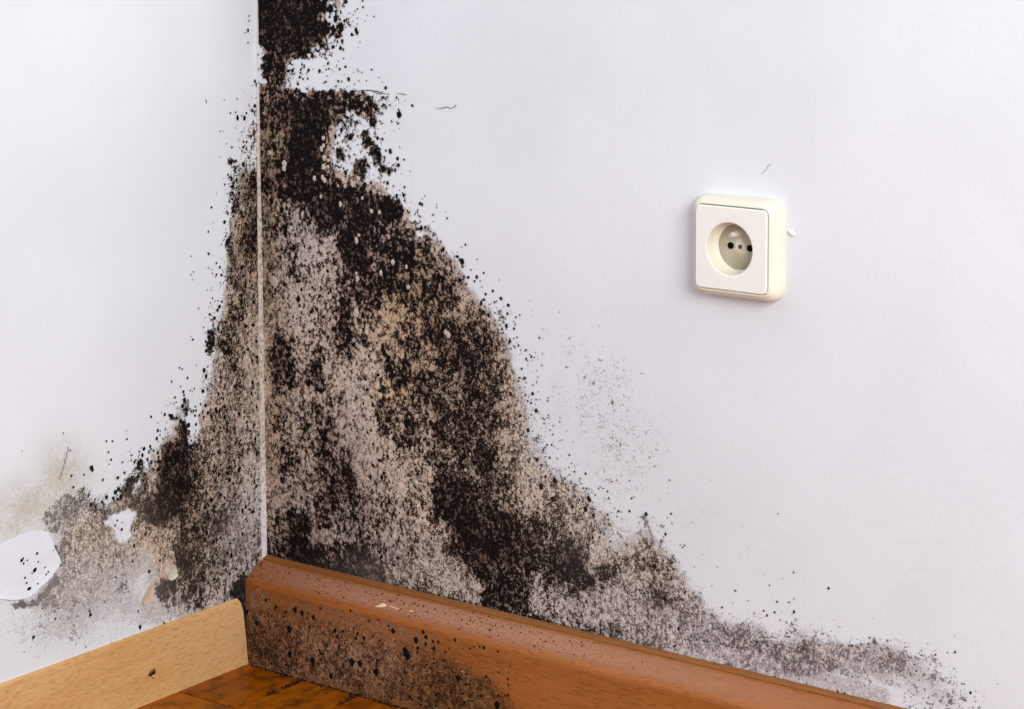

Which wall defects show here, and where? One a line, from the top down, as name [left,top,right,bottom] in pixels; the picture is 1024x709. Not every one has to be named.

peeling [0,531,61,600]
peeling [111,514,133,541]
water stain [11,120,519,709]
water stain [252,0,966,709]